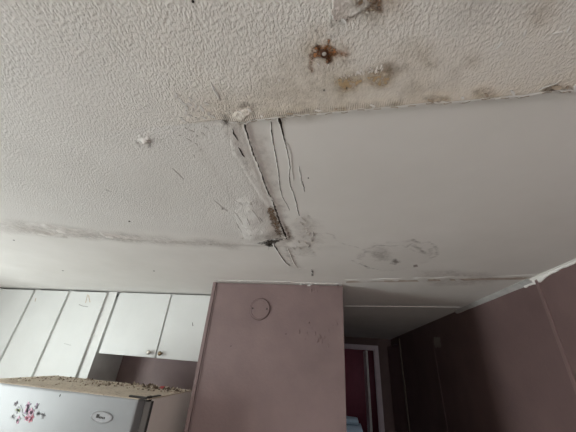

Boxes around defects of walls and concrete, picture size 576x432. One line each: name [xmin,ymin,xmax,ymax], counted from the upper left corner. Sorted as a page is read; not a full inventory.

rust [310,39,346,63]
spalling [232,108,251,121]
crack [242,118,305,267]